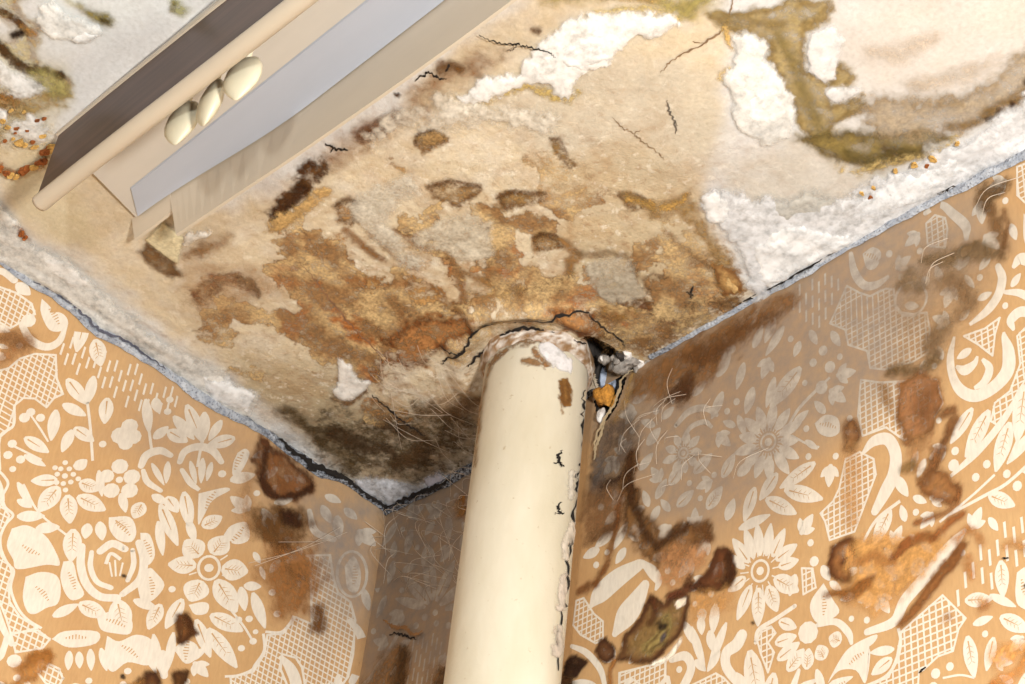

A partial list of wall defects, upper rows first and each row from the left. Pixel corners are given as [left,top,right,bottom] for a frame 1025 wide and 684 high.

corrosion [0,106,55,180]
damp [0,0,72,118]
peeling [361,5,680,148]
peeling [719,32,796,146]
damp [640,0,1025,174]
peeling [807,27,860,102]
peeling [701,92,1025,302]
crack [440,310,625,367]
damp [197,138,794,684]
damp [826,180,1009,627]
damp [135,670,189,684]
damp [175,613,199,644]